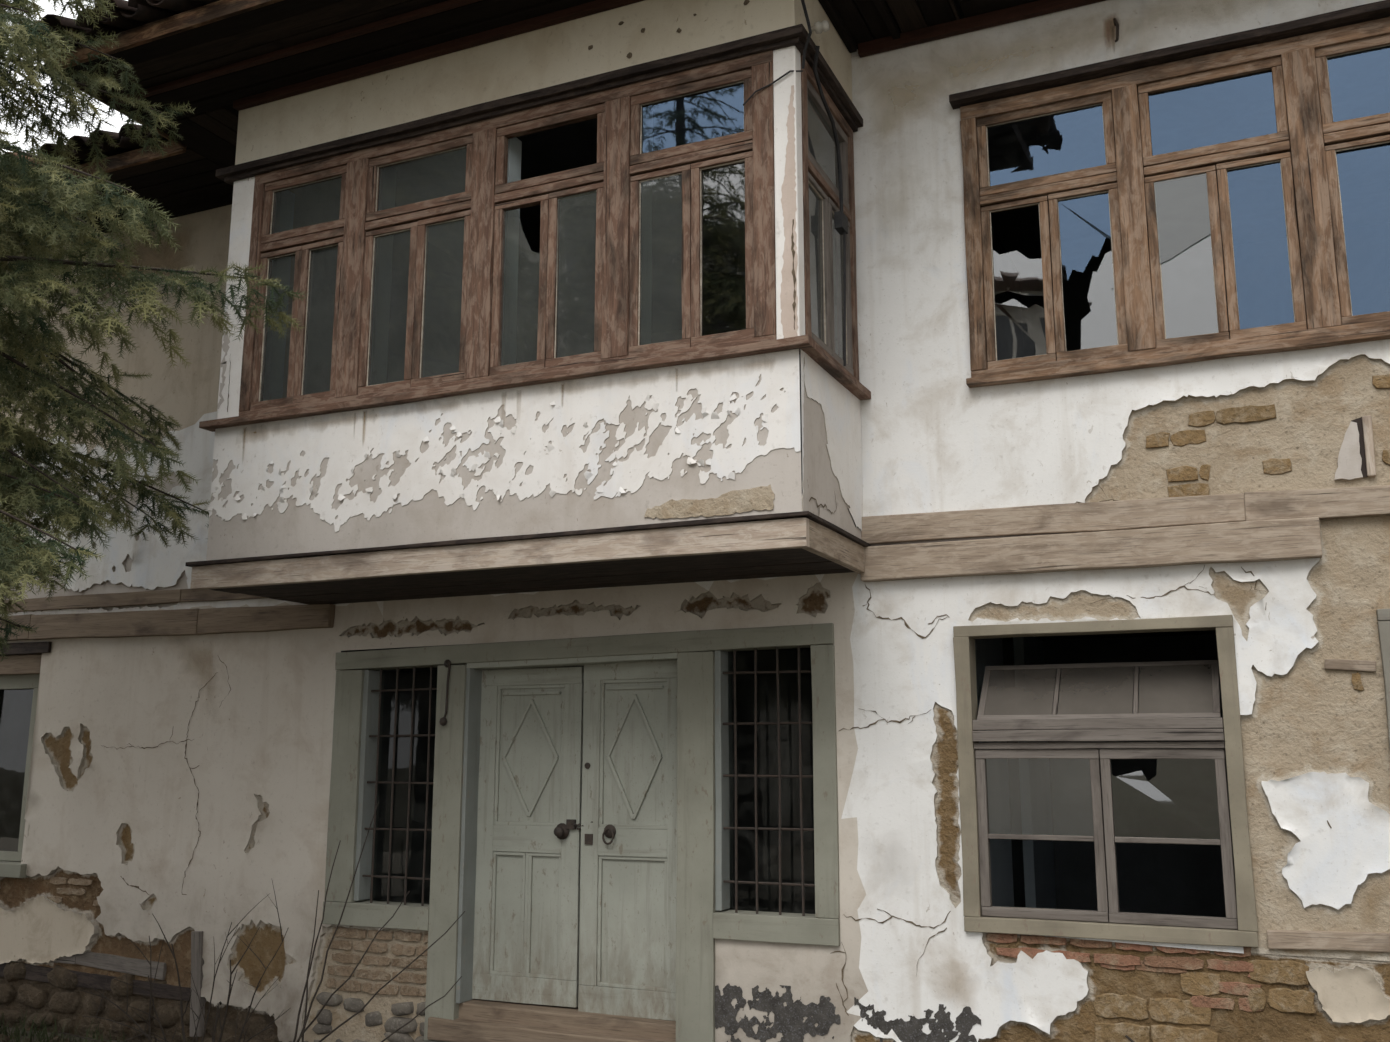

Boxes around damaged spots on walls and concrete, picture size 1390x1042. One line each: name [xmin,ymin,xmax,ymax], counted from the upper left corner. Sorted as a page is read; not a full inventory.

peeling [780,85,798,338]
peeling [206,356,862,561]
spalling [1085,354,1390,503]
peeling [5,471,192,613]
peeling [339,615,485,639]
peeling [679,582,831,619]
crack [862,585,949,639]
spalling [41,723,93,792]
spalling [116,823,135,865]
crack [104,656,231,895]
spalling [715,515,1390,1042]
spalling [0,860,428,1042]